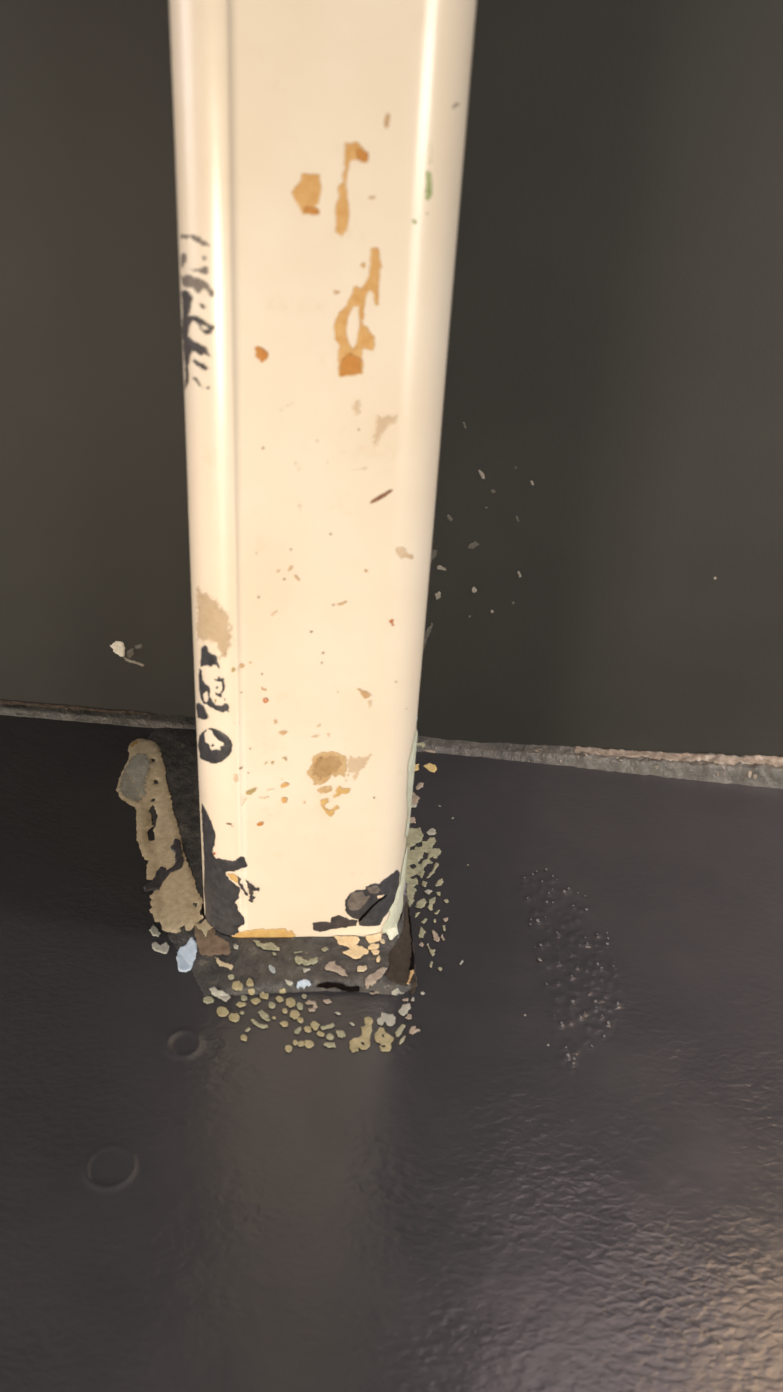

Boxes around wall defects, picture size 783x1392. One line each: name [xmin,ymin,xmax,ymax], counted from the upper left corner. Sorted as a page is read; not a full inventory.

peeling [116,739,210,972]
peeling [405,742,449,971]
peeling [203,932,425,1052]